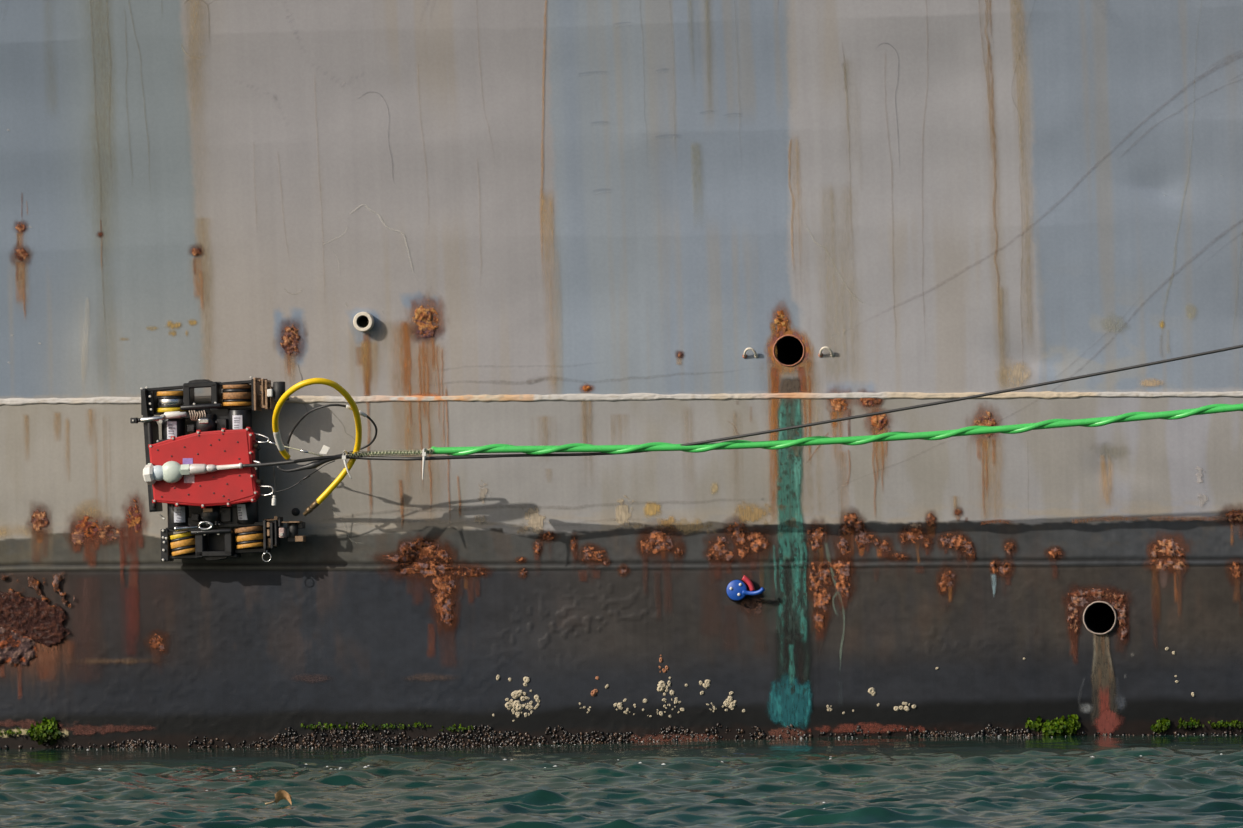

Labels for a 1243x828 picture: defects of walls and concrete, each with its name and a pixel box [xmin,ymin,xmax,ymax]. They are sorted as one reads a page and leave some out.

corrosion [14,222,29,279]
corrosion [280,323,303,357]
corrosion [399,300,447,396]
corrosion [640,309,812,562]
corrosion [829,398,888,449]
corrosion [0,574,75,691]
corrosion [380,538,487,654]
water stain [768,379,812,727]
corrosion [807,512,975,634]
corrosion [1066,588,1128,650]
corrosion [1148,537,1186,608]
water stain [1081,633,1124,736]